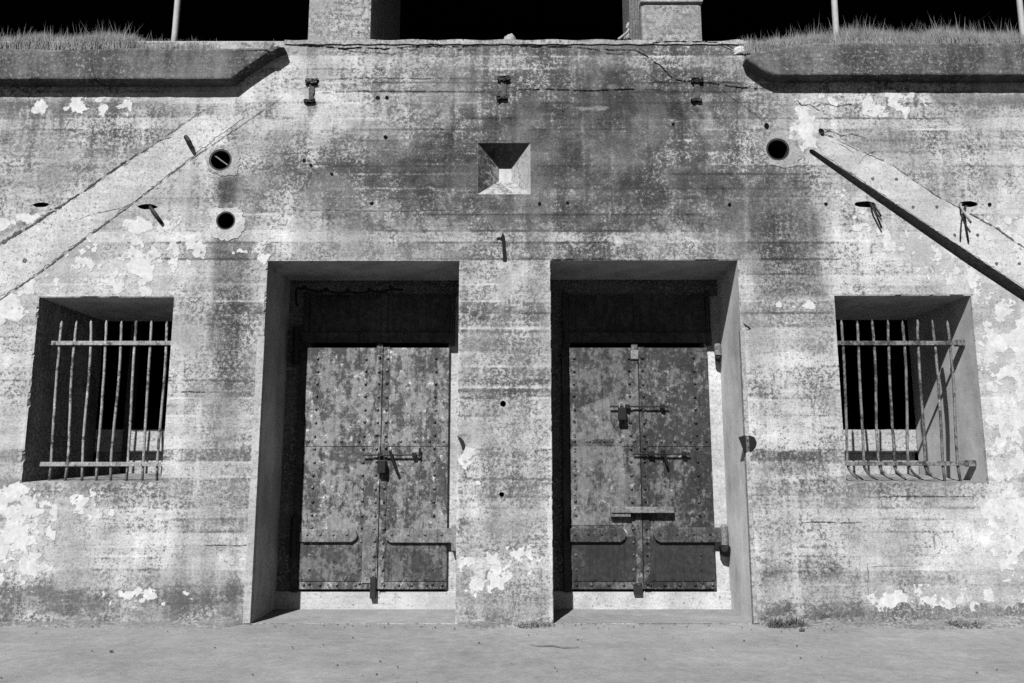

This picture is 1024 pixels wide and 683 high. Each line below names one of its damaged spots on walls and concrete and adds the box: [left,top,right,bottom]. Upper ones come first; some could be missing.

peeling [13,98,48,115]
peeling [58,94,132,117]
crack [299,45,631,129]
crack [513,41,764,121]
peeling [780,90,841,153]
peeling [862,90,928,119]
peeling [0,202,207,325]
peeling [836,188,1024,582]
peeling [0,481,115,592]
peeling [102,586,165,609]
peeling [459,541,543,598]
spalling [851,584,1024,621]